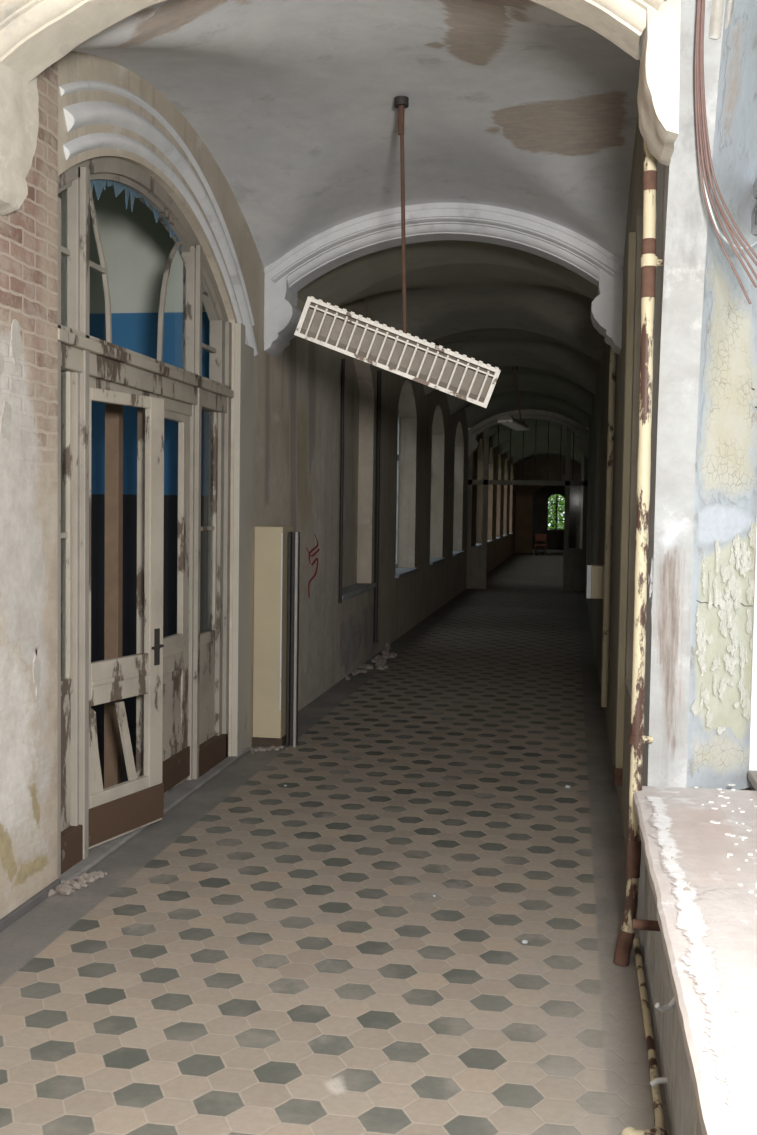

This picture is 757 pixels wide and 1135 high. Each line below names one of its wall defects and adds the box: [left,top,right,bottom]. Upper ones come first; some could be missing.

flaking render [422,0,540,68]
flaking render [482,90,631,157]
flaking render [0,136,56,894]
water stain [0,592,50,863]
peeling [686,522,757,896]
peeling [645,796,757,1135]